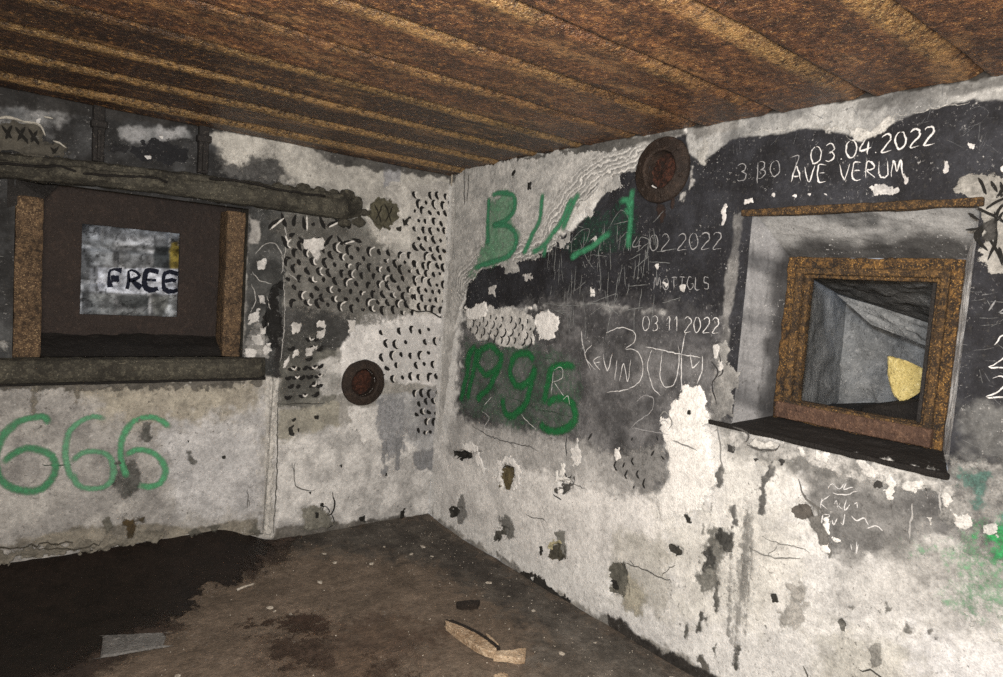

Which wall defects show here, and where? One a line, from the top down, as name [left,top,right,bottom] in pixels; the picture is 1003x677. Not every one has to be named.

spalling [454,441,522,491]
flaking render [613,340,1003,560]
spalling [539,530,566,561]
leakage [0,530,299,677]
spalling [609,562,647,617]
flaking render [771,578,809,630]
crack [859,643,882,677]